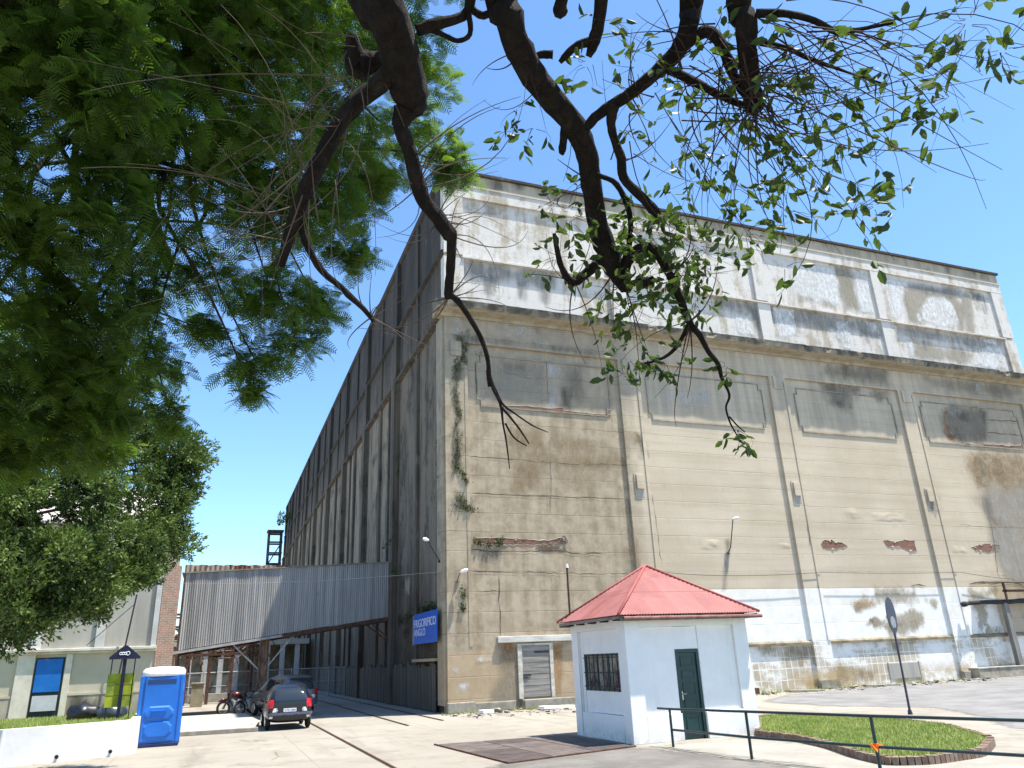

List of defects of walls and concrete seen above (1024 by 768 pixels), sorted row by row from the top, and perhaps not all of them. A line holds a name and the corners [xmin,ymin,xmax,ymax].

damp [469,263,555,300]
damp [716,299,759,331]
damp [771,306,878,336]
damp [907,329,992,349]
spalling [473,537,567,546]
spalling [821,540,847,550]
spalling [883,539,917,552]
spalling [971,543,1001,553]
damp [983,488,1024,580]